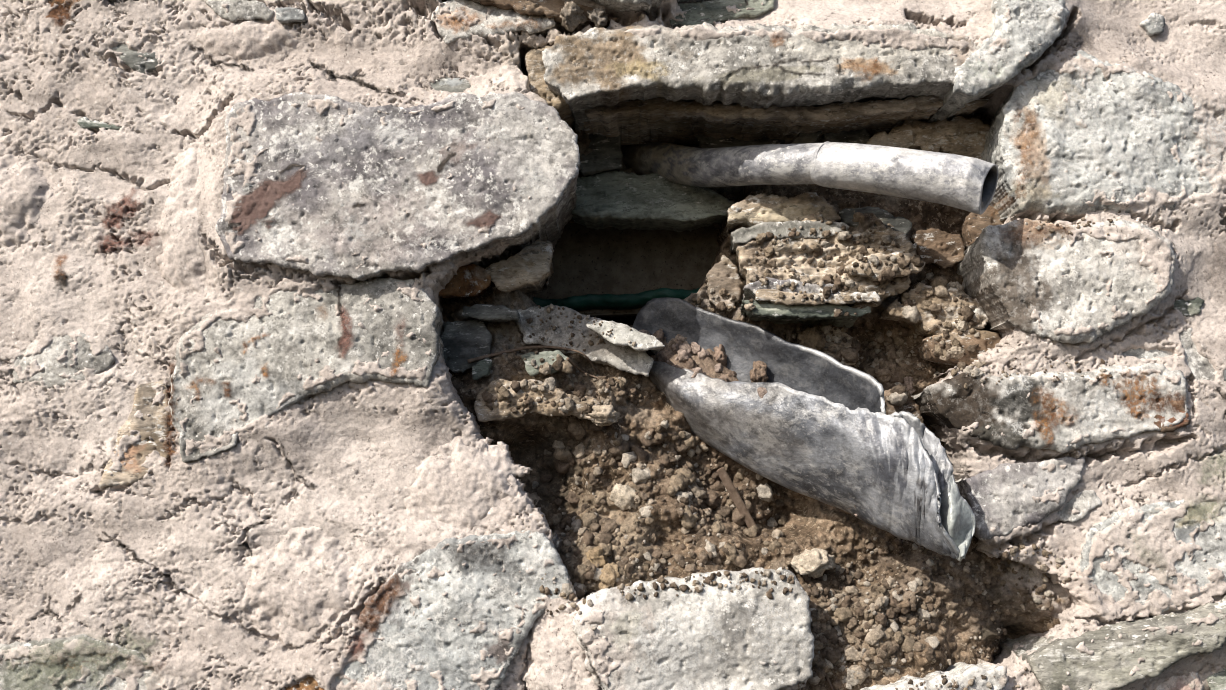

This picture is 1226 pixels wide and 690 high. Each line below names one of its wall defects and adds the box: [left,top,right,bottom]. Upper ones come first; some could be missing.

spalling [418,170,439,185]
spalling [466,210,501,228]
corrosion [1102,371,1186,418]
corrosion [1034,392,1077,448]
crack [102,532,182,591]